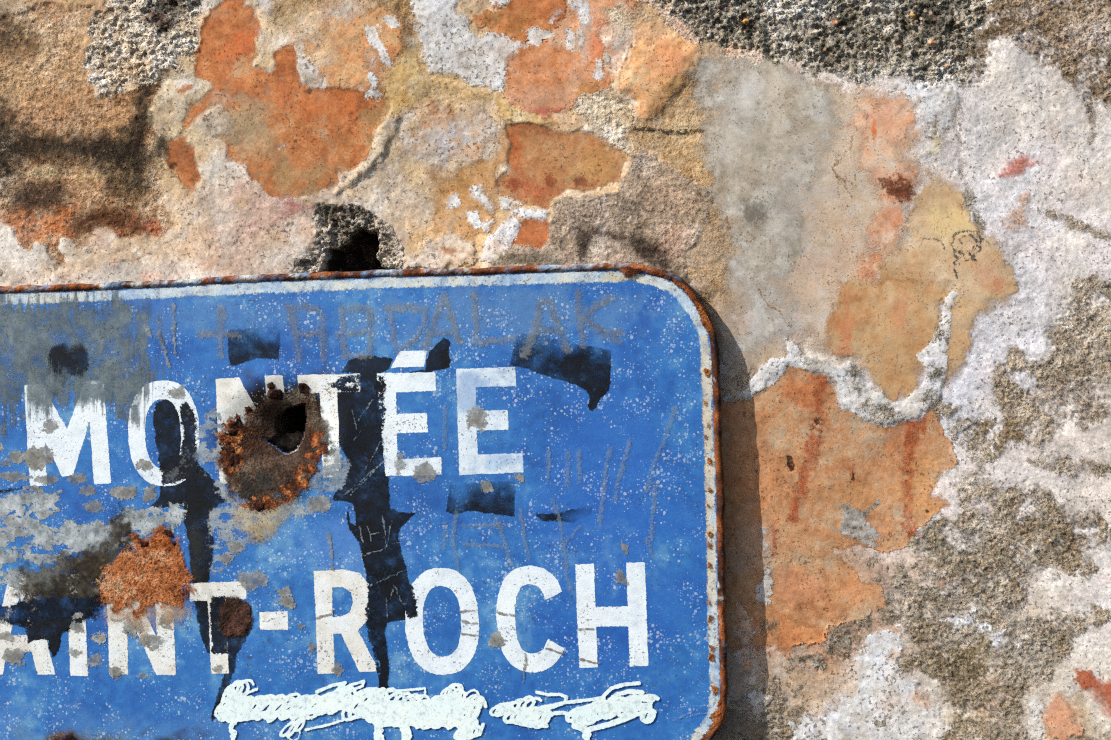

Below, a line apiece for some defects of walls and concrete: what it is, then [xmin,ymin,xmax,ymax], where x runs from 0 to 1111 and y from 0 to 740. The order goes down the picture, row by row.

damp [0,68,169,199]
peeling [0,0,431,272]
damp [16,184,62,209]
damp [74,210,141,231]
peeling [398,0,1111,672]
peeling [1027,690,1083,740]
peeling [1074,669,1111,713]